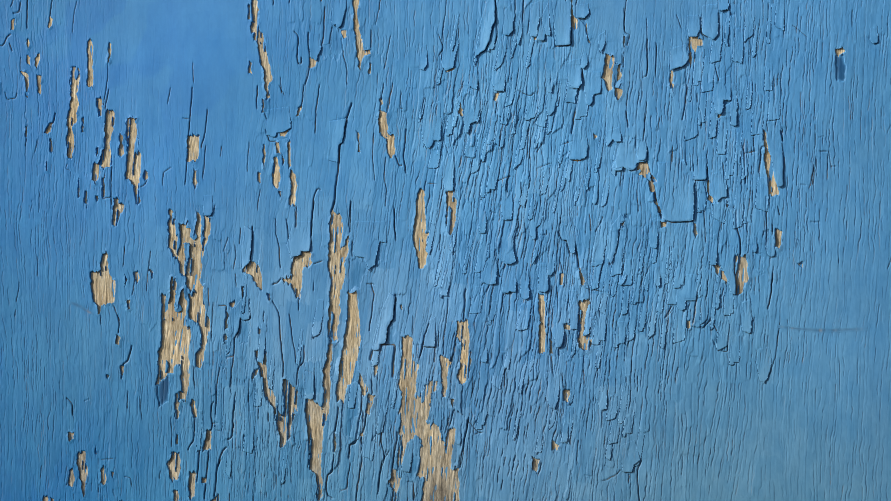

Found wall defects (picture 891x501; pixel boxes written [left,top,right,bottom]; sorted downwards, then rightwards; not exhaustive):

peeling [64,39,148,226]
peeling [91,247,153,317]
peeling [156,134,213,452]
peeling [248,0,274,113]
crack [171,105,353,501]
crack [280,11,347,131]
crack [326,283,398,501]
peeling [224,210,512,501]
crack [372,135,406,234]
crack [445,382,481,468]
crack [481,0,529,53]
peeling [411,0,783,472]